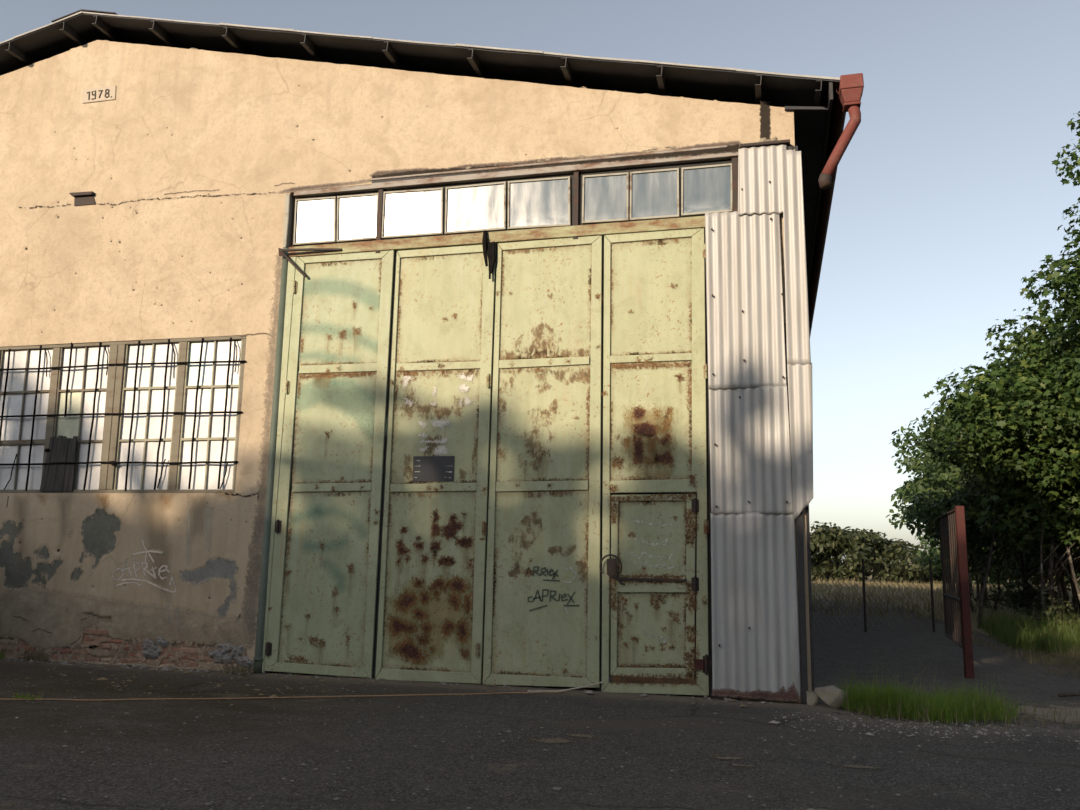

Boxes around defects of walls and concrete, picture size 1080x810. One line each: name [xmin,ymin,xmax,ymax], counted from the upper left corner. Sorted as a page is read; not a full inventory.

crack [99,183,294,206]
corrosion [496,247,551,296]
flaking render [0,255,283,672]
corrosion [295,448,486,672]
corrosion [388,359,478,420]
corrosion [492,303,709,687]